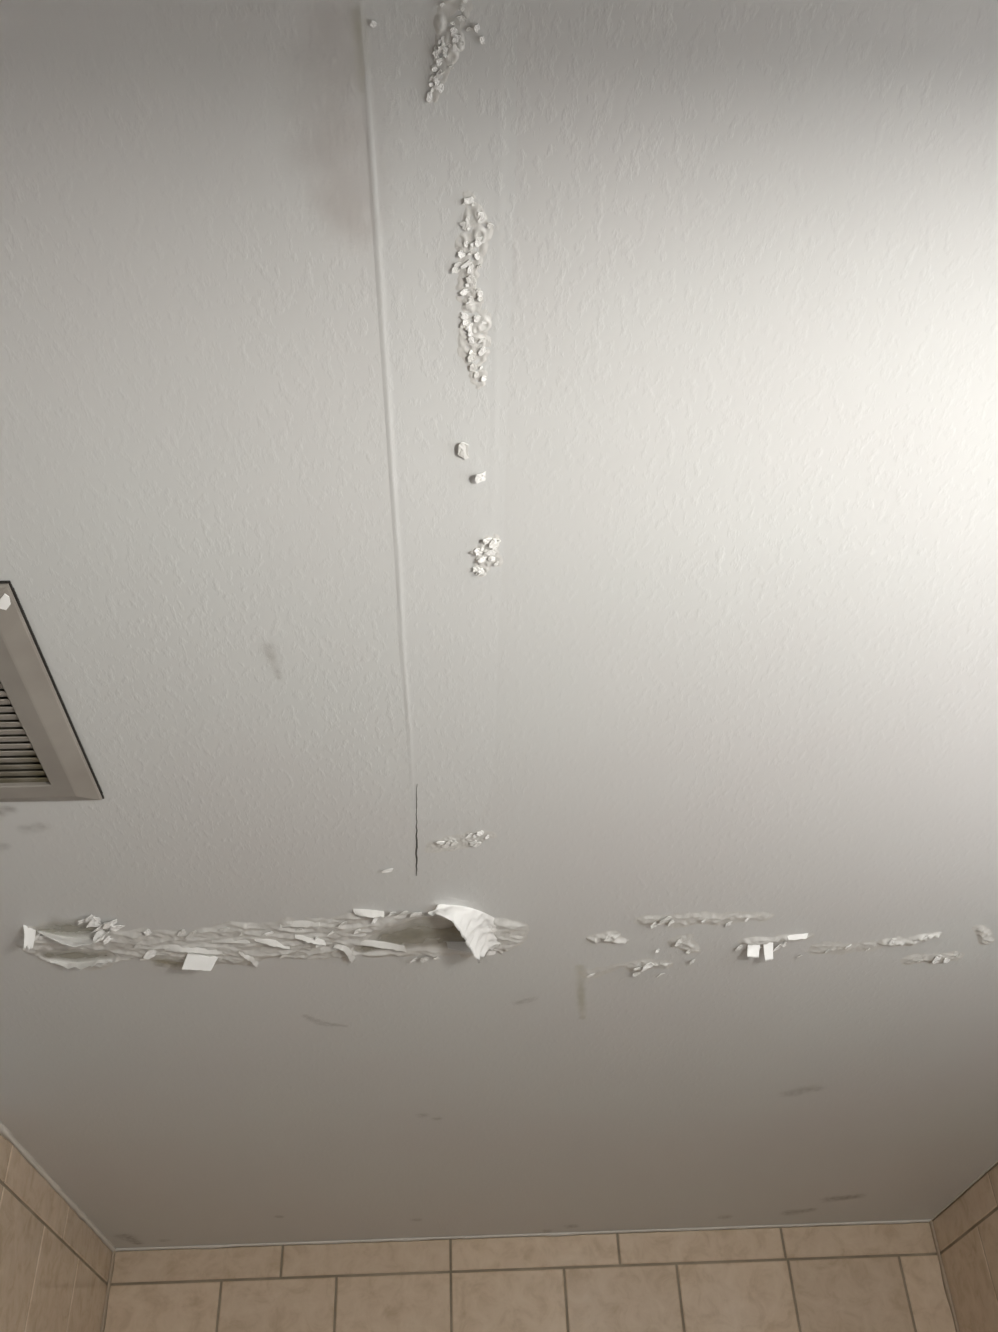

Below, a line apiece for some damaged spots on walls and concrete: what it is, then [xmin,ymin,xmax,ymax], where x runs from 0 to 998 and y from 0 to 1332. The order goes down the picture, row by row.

crack [412,788,420,876]
peeling [14,904,530,971]
peeling [578,911,965,978]